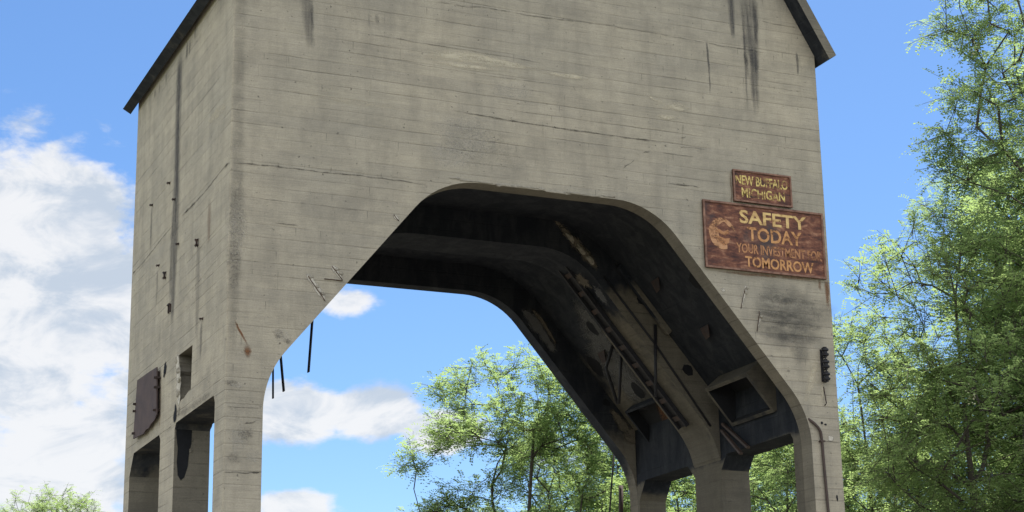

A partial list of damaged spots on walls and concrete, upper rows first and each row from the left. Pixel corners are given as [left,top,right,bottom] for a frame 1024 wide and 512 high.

damp [170,68,181,301]
spalling [555,221,596,267]